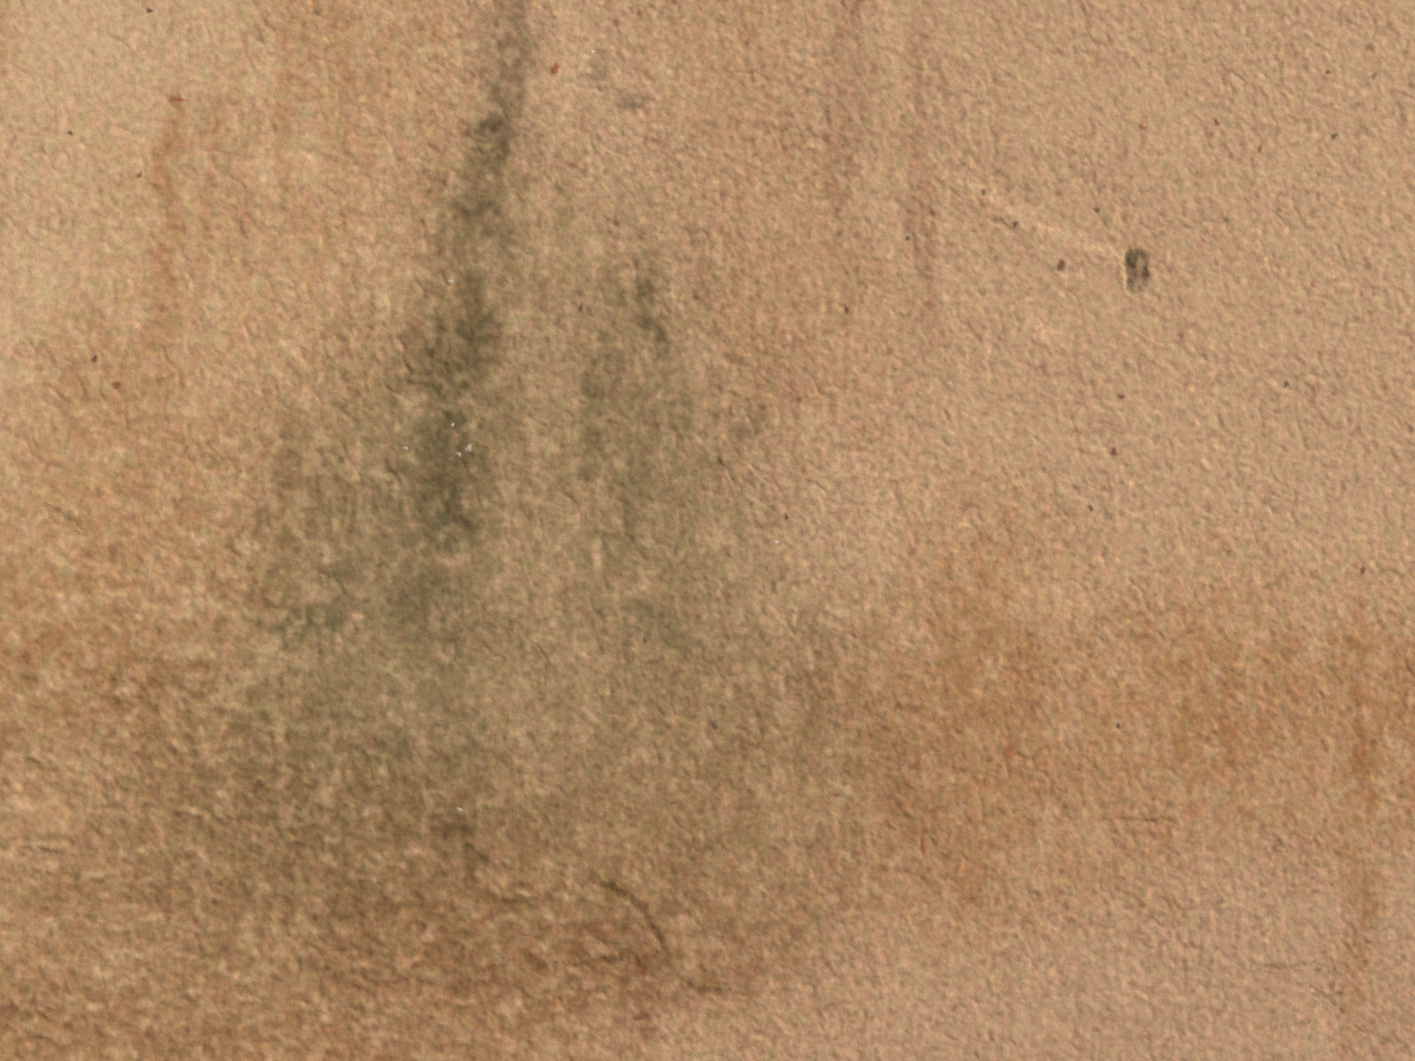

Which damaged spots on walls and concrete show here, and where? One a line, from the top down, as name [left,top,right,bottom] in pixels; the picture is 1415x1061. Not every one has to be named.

water stain [0,0,960,889]
rust [888,437,1415,1061]